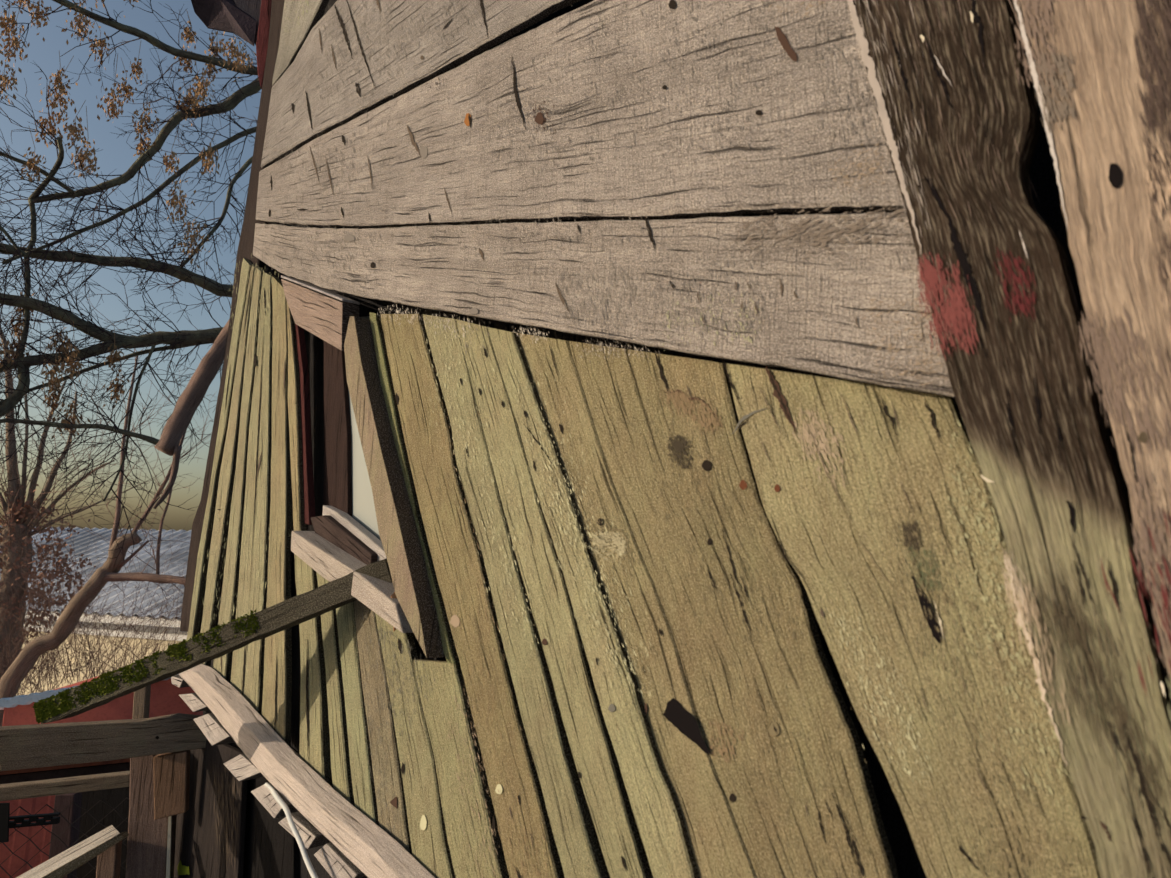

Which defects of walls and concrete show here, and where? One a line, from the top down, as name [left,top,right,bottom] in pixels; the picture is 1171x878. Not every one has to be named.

peeling [917,253,979,360]
peeling [993,231,1037,322]
peeling [1129,525,1171,698]
crack [805,793,864,878]
crack [955,836,979,870]